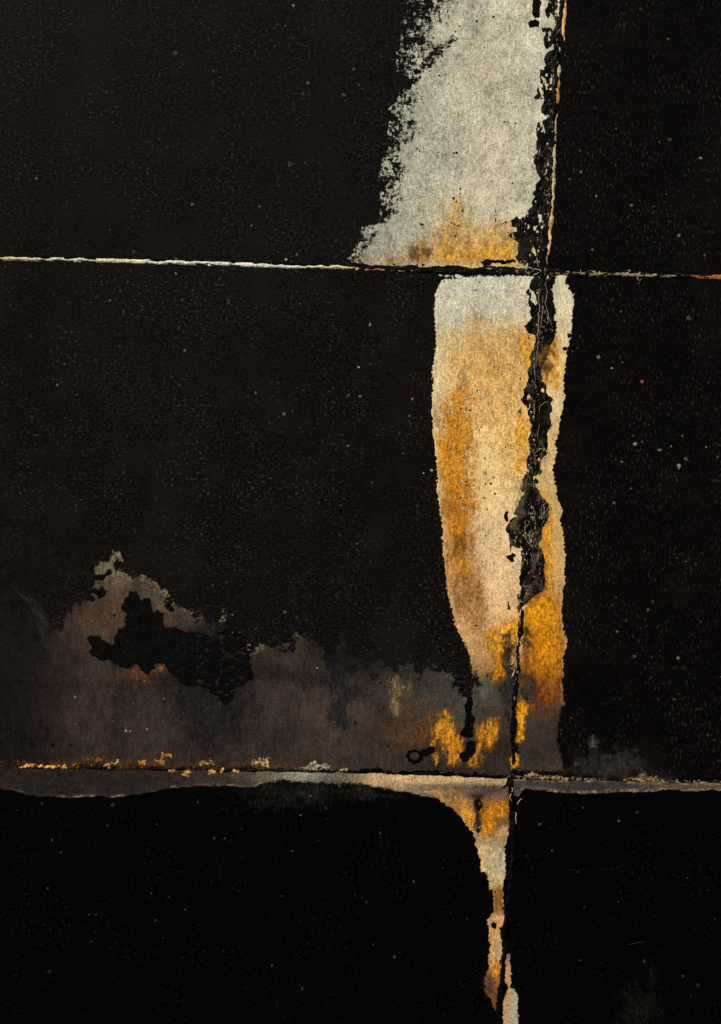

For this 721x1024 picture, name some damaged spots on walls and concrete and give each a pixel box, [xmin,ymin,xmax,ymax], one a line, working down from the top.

peeling [348,0,560,268]
rust [386,196,518,266]
rust [437,313,564,769]
peeling [0,274,721,1024]
rust [391,676,500,766]
crack [505,648,523,728]
water stain [296,761,348,771]
rust [451,799,508,837]
rust [494,889,502,909]